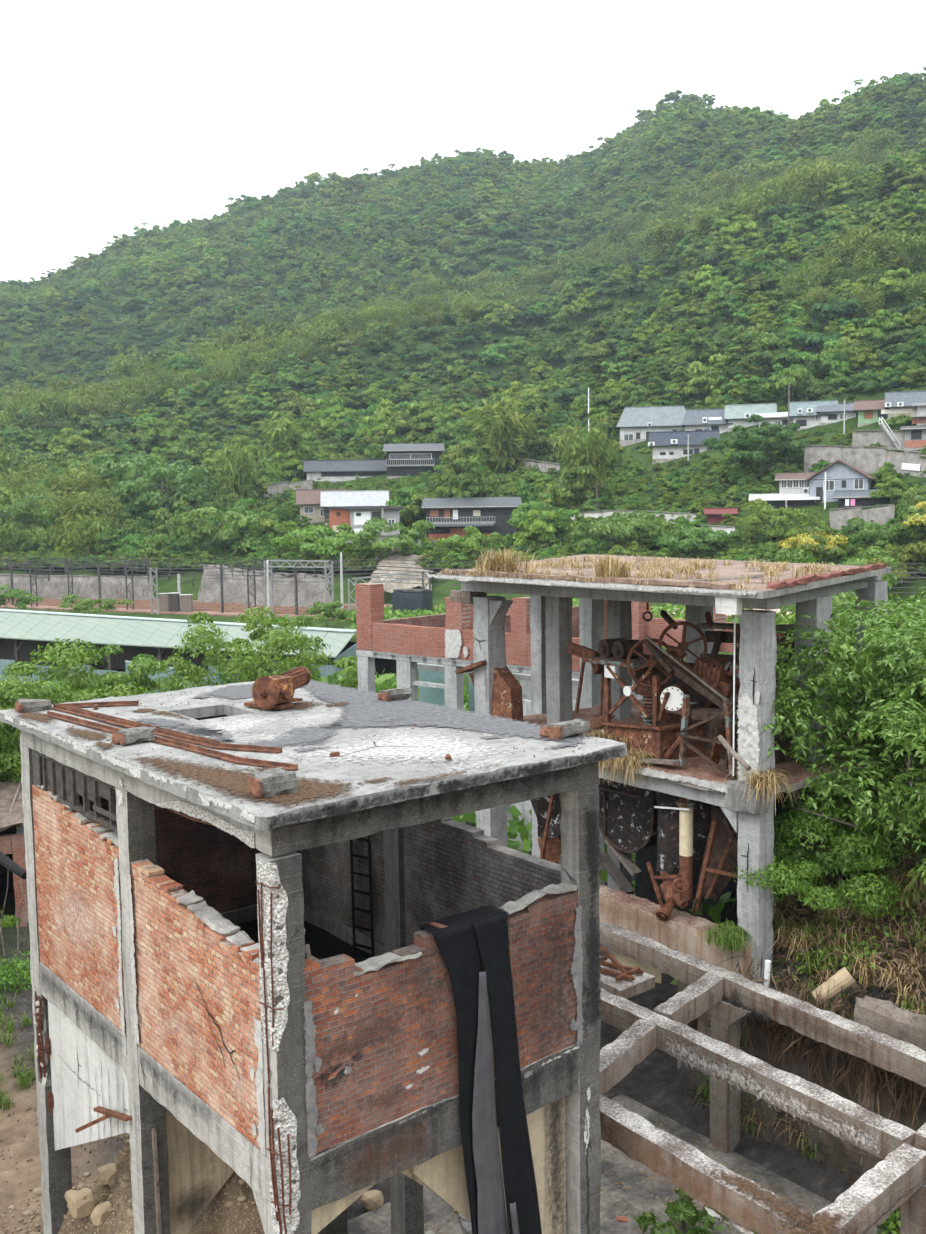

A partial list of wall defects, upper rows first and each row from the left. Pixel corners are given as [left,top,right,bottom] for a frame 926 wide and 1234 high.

spalling [4,713,301,1234]
crack [194,979,272,1093]